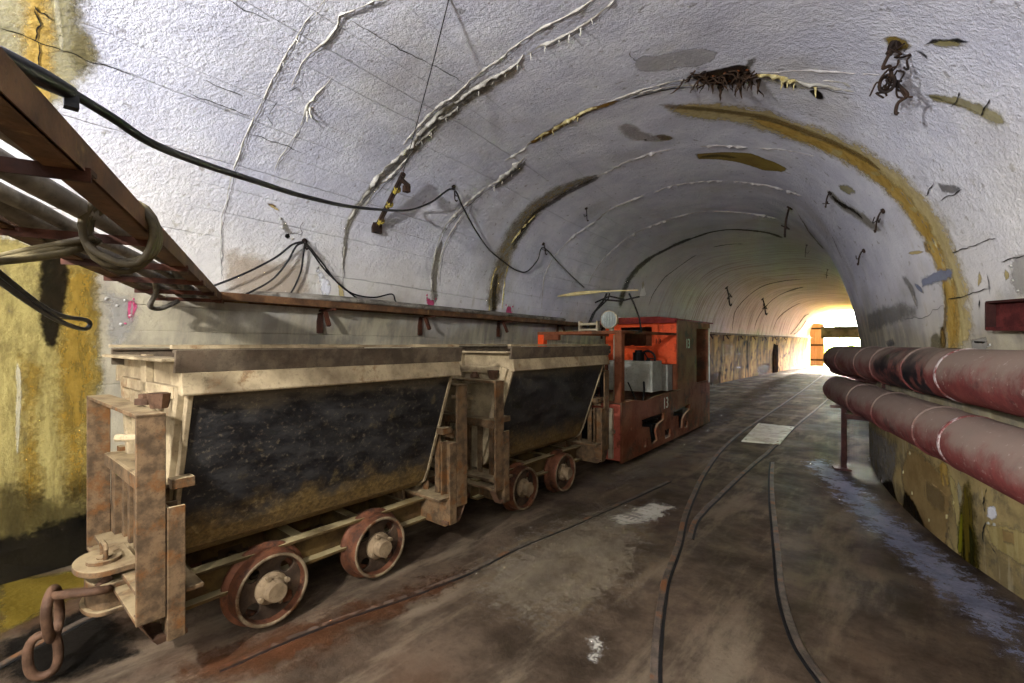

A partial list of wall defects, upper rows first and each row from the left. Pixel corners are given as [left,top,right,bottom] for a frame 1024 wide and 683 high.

damp [0,0,97,87]
damp [36,86,63,105]
crack [1,7,137,78]
spalling [670,59,771,101]
crack [191,0,462,281]
damp [431,100,619,305]
damp [541,180,801,308]
damp [868,269,952,331]
damp [931,331,945,348]
damp [801,428,1024,662]